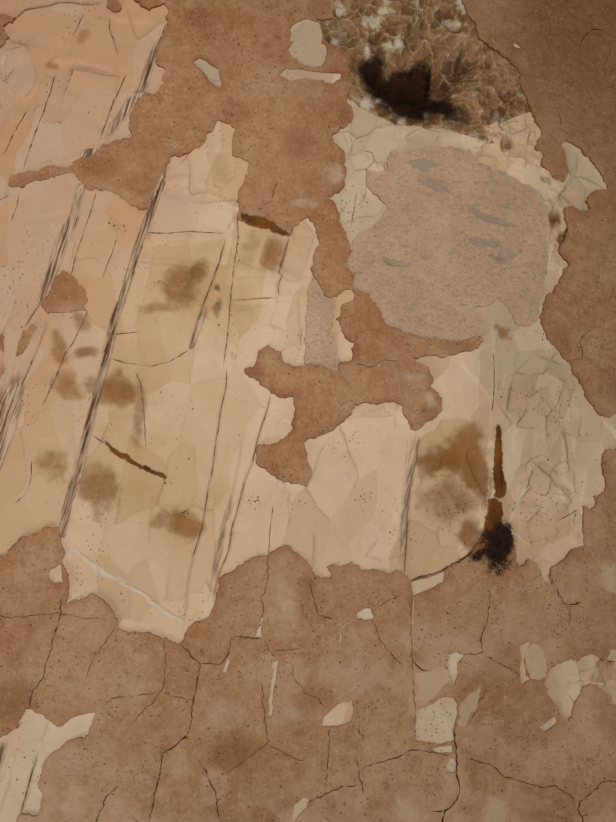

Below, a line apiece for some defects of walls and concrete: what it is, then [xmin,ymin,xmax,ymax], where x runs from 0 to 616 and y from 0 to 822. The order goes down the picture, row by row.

spalling [0,0,616,644]
rust [421,425,507,548]
spalling [0,708,95,822]
crack [1,600,96,708]
crack [105,560,302,822]
spalling [269,660,278,716]
spalling [322,700,354,726]
spalling [448,652,463,684]
crack [307,547,616,822]
spalling [520,641,530,684]
spalling [540,649,616,732]